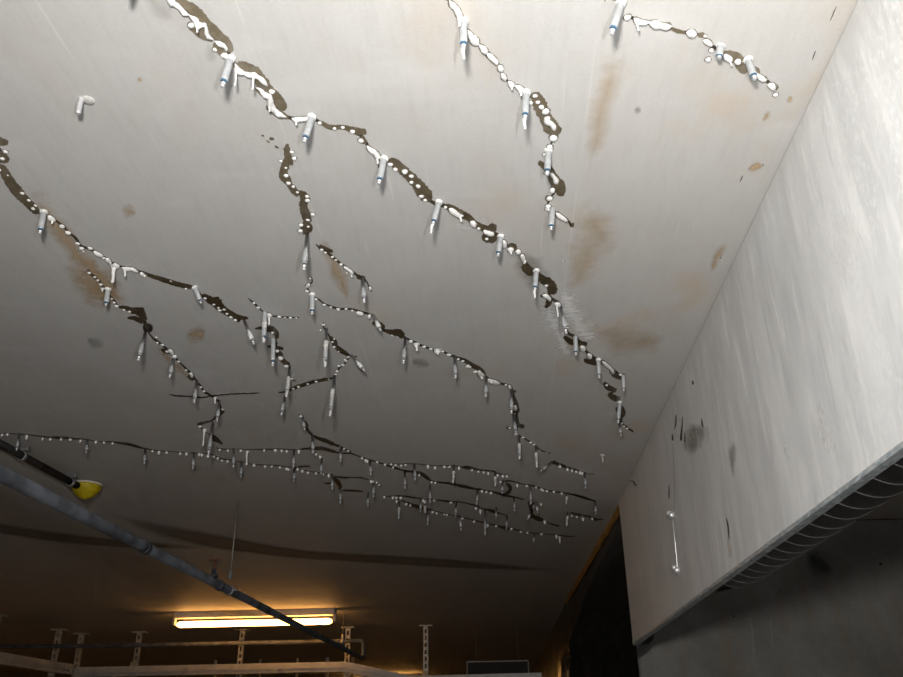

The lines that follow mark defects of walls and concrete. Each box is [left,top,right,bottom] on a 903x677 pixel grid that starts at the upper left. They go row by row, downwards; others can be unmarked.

crack [604,0,779,97]
crack [0,0,634,543]
damp [542,289,596,355]